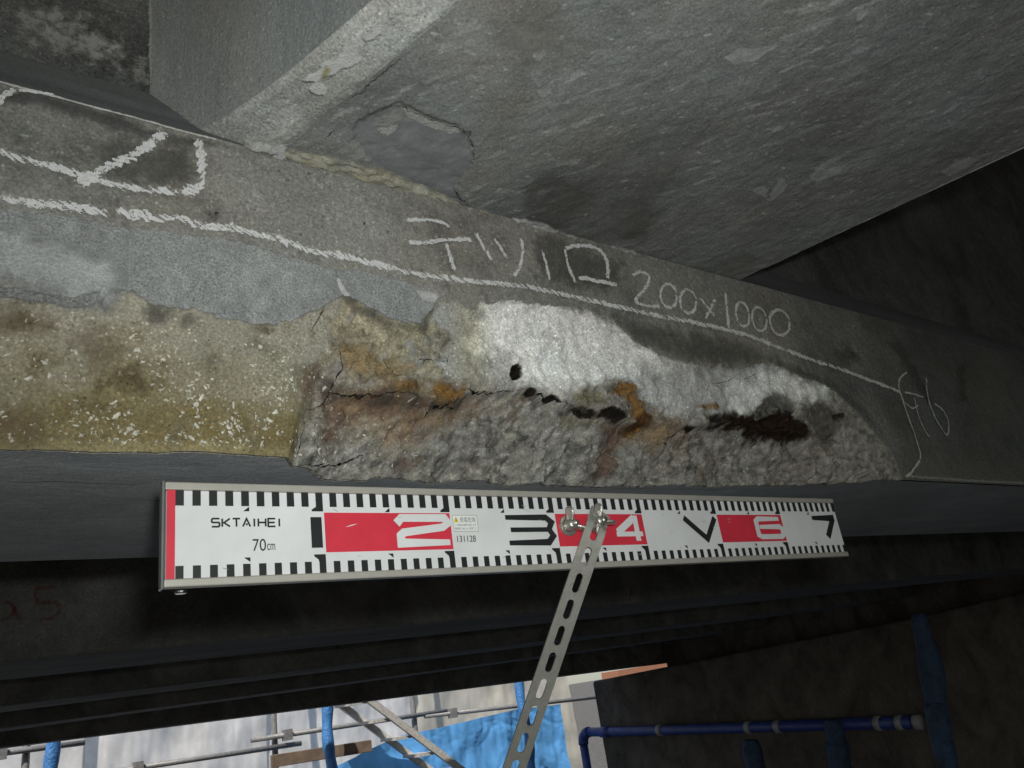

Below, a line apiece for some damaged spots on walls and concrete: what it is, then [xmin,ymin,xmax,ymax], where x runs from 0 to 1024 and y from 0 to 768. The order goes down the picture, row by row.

peeling [340,102,471,202]
crack [297,349,573,468]
spalling [0,278,900,489]
rust [573,382,651,478]
rust [703,403,809,445]